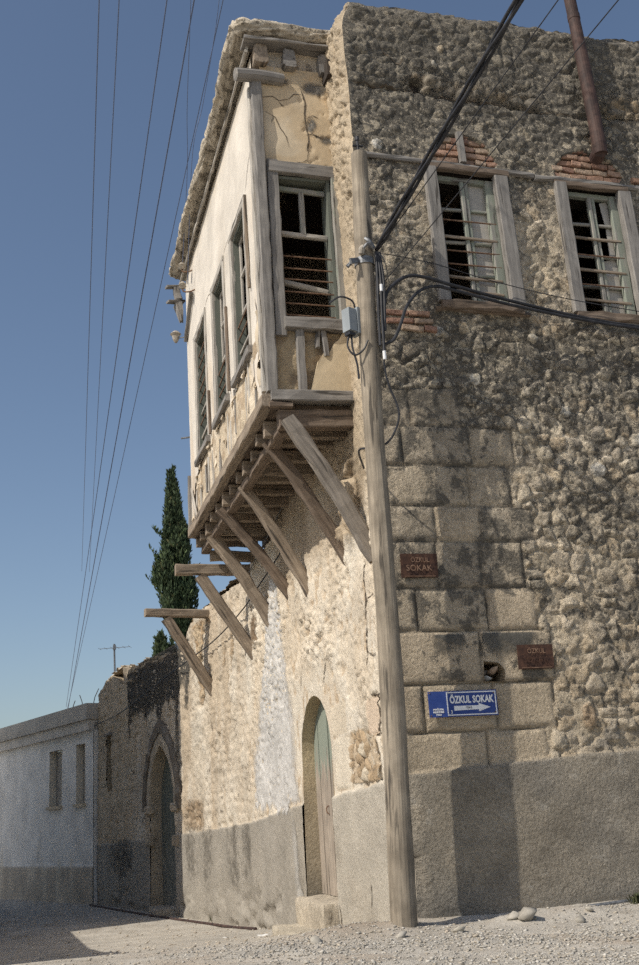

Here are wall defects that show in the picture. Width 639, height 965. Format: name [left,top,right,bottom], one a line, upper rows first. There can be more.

crack [265,89,326,163]
spalling [431,136,497,168]
spalling [552,150,639,185]
spalling [386,309,437,334]
spalling [348,729,382,783]